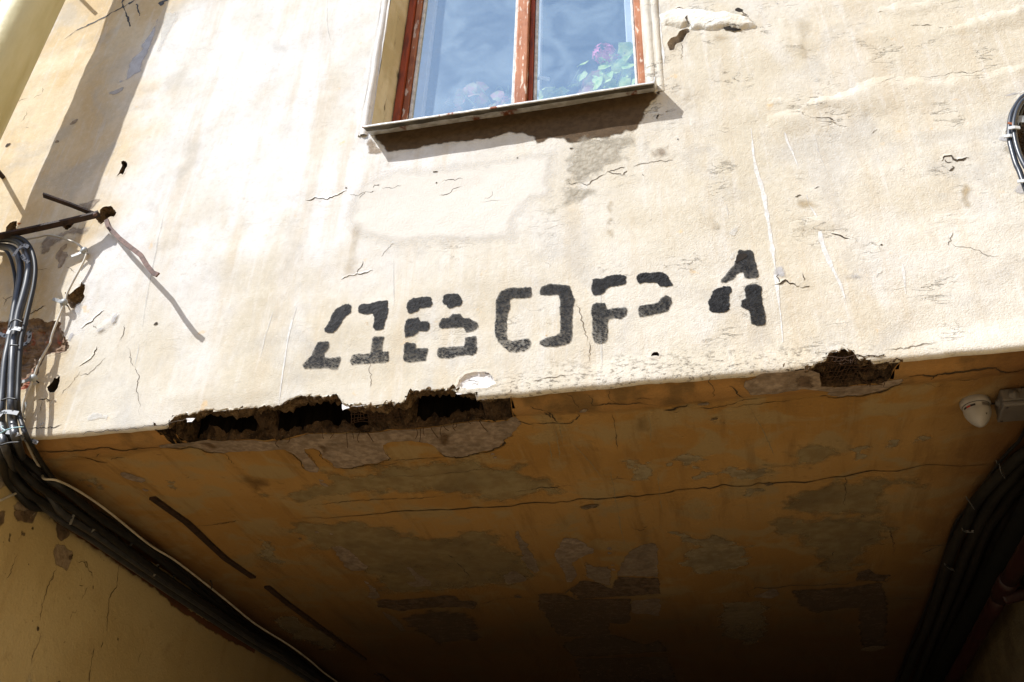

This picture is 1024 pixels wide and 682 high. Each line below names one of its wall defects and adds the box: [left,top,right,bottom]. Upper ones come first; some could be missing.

spalling [665,27,693,52]
crack [305,185,397,201]
crack [567,160,666,185]
spalling [0,281,88,395]
crack [34,310,234,464]
spalling [153,369,521,487]
crack [287,304,1024,519]
spalling [744,344,903,397]
crack [31,561,120,681]